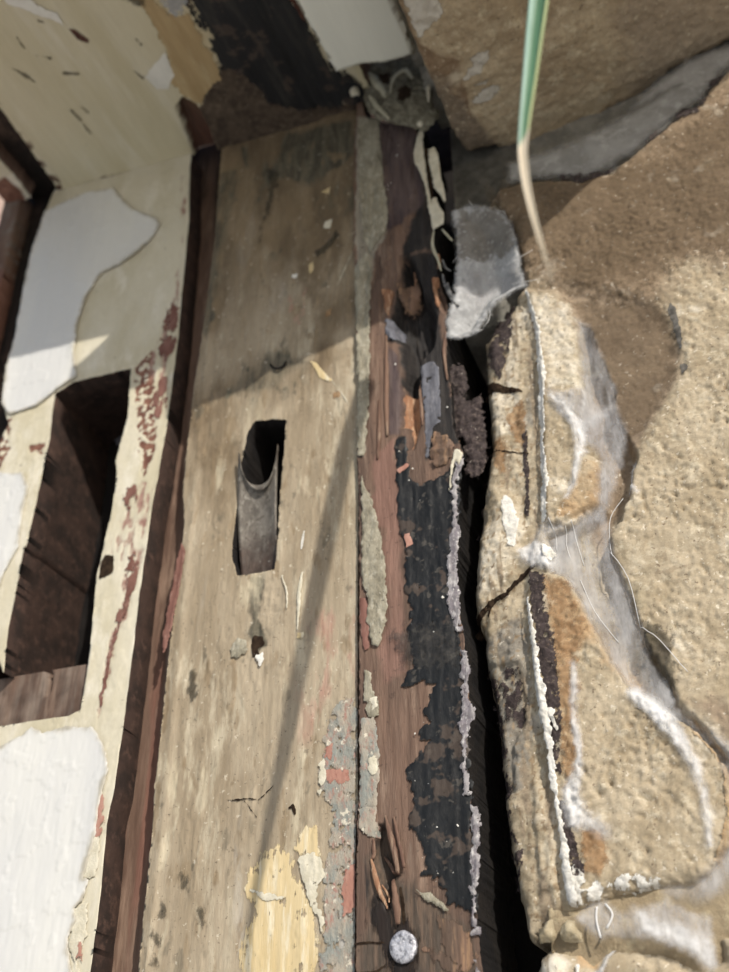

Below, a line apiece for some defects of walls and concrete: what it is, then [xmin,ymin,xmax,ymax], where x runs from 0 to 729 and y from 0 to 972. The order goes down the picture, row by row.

water stain [159,0,368,151]
water stain [673,76,722,123]
peeling [1,188,160,414]
water stain [487,288,549,547]
peeling [0,726,108,972]
peeling [237,670,381,972]
peeling [359,476,388,650]
peeling [394,436,482,972]
crack [476,564,535,641]
spalling [502,767,583,972]
water stain [487,571,663,908]
water stain [642,620,675,704]